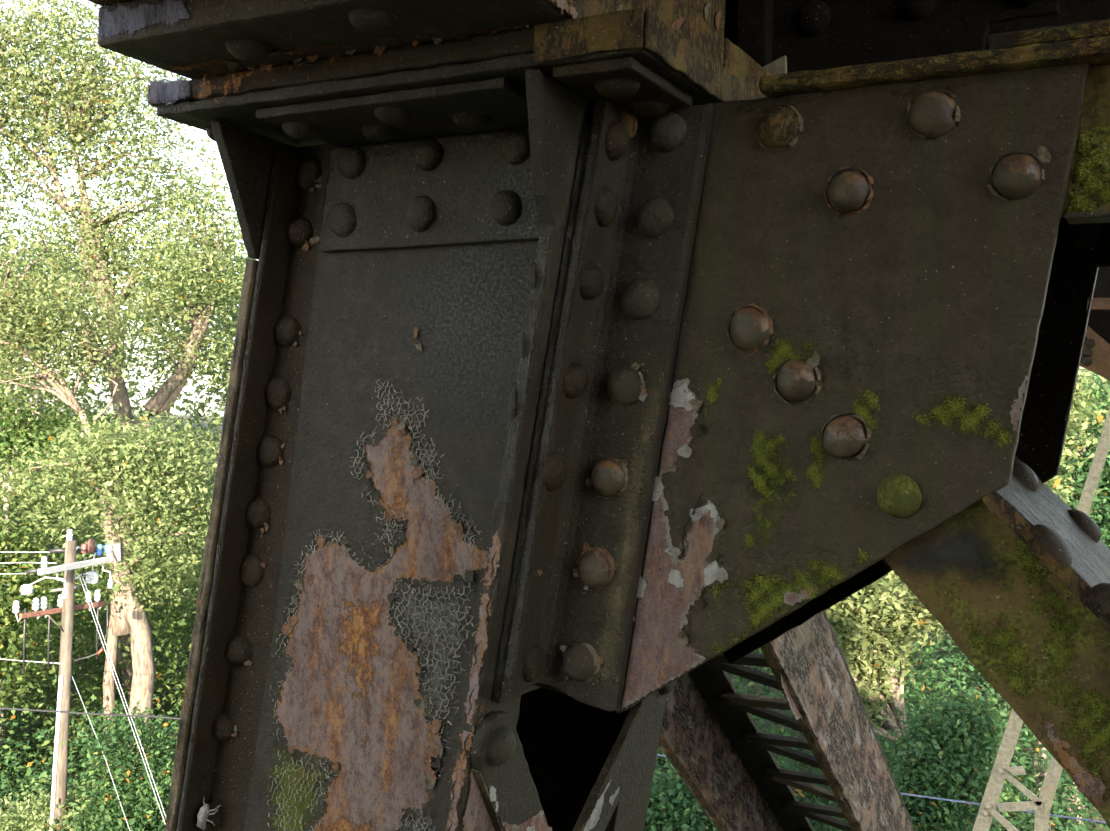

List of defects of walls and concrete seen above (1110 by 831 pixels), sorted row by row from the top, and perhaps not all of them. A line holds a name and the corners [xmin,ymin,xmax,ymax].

corrosion [556,0,579,19]
corrosion [187,50,356,102]
peeling [616,378,728,711]
damp [896,523,997,579]
corrosion [273,417,501,831]
corrosion [780,673,802,720]
peeling [489,786,552,831]
peeling [583,779,620,831]